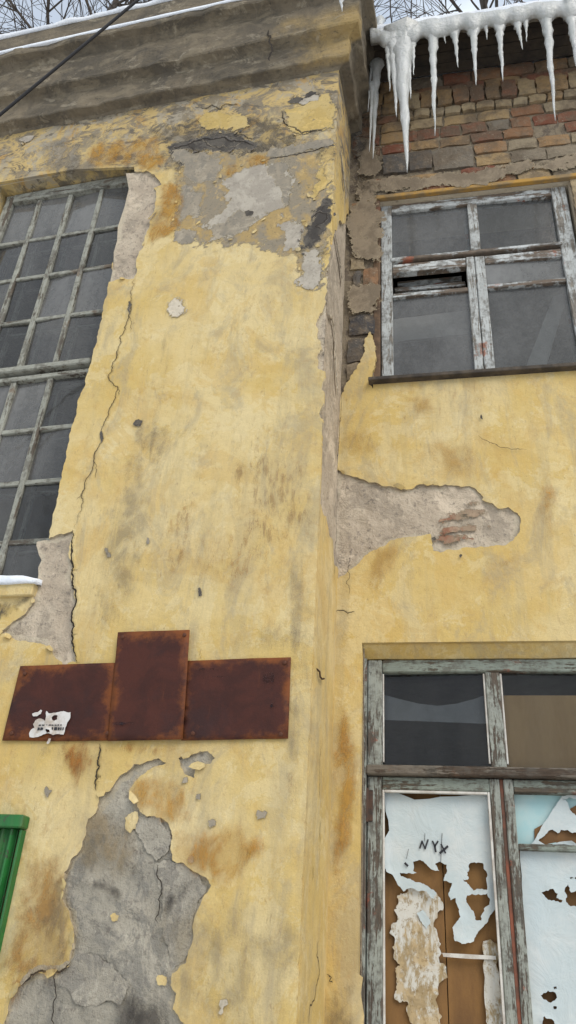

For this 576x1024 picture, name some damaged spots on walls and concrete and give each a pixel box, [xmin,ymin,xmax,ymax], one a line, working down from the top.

crack [170,111,346,283]
flaking render [166,91,521,578]
crack [70,277,137,663]
flaking render [0,533,76,665]
corrosion [65,747,82,774]
flaking render [180,751,214,783]
flaking render [5,759,211,1024]